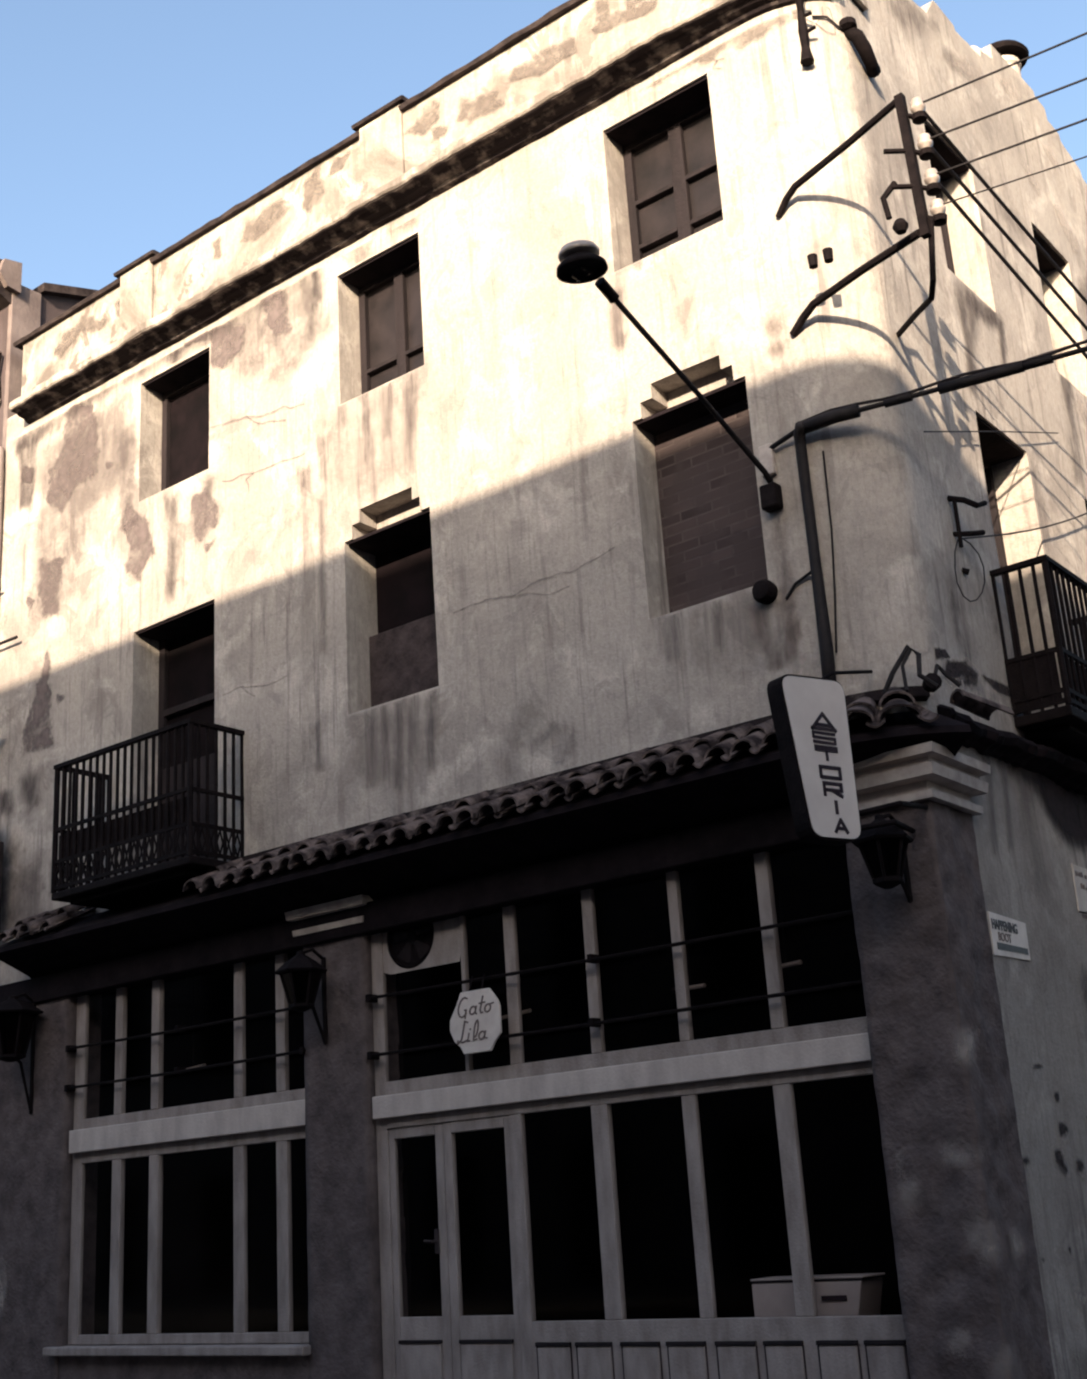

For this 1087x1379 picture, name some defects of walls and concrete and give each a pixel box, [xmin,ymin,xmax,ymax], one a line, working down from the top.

peeling [22,403,113,512]
peeling [122,505,154,579]
peeling [191,488,217,551]
peeling [26,558,64,616]
peeling [23,652,63,752]
spalling [1055,1123,1084,1172]